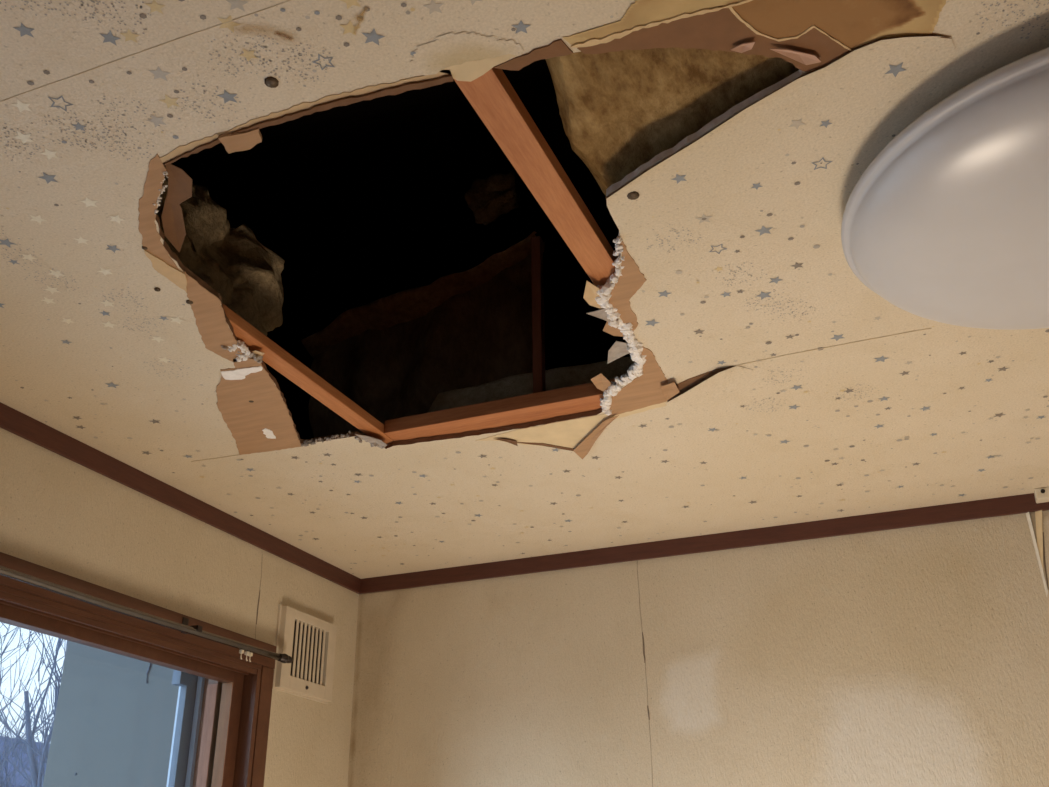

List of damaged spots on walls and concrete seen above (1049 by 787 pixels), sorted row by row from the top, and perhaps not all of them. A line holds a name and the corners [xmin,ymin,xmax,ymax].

peeling [138,0,956,459]